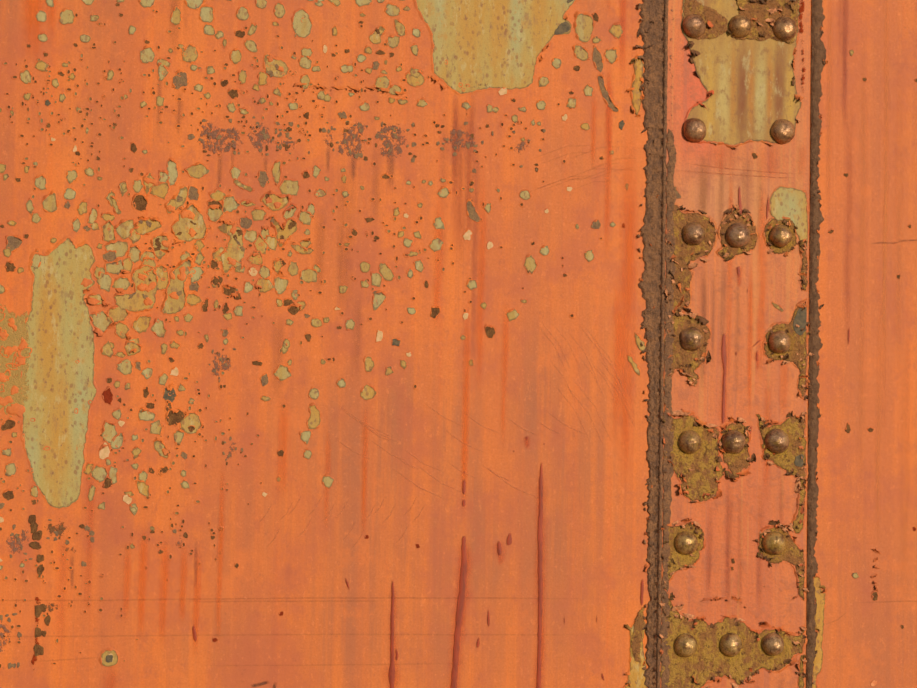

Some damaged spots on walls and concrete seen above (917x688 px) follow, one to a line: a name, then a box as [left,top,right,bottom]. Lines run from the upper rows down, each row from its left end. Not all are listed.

peeling [19,0,76,107]
peeling [138,0,625,130]
peeling [626,3,653,117]
peeling [680,0,806,159]
peeling [0,156,356,516]
peeling [359,261,395,311]
peeling [397,216,445,288]
peeling [716,416,756,482]
peeling [0,489,15,524]
corrosion [389,582,398,688]
corrosion [451,536,467,688]
corrosion [631,580,645,663]